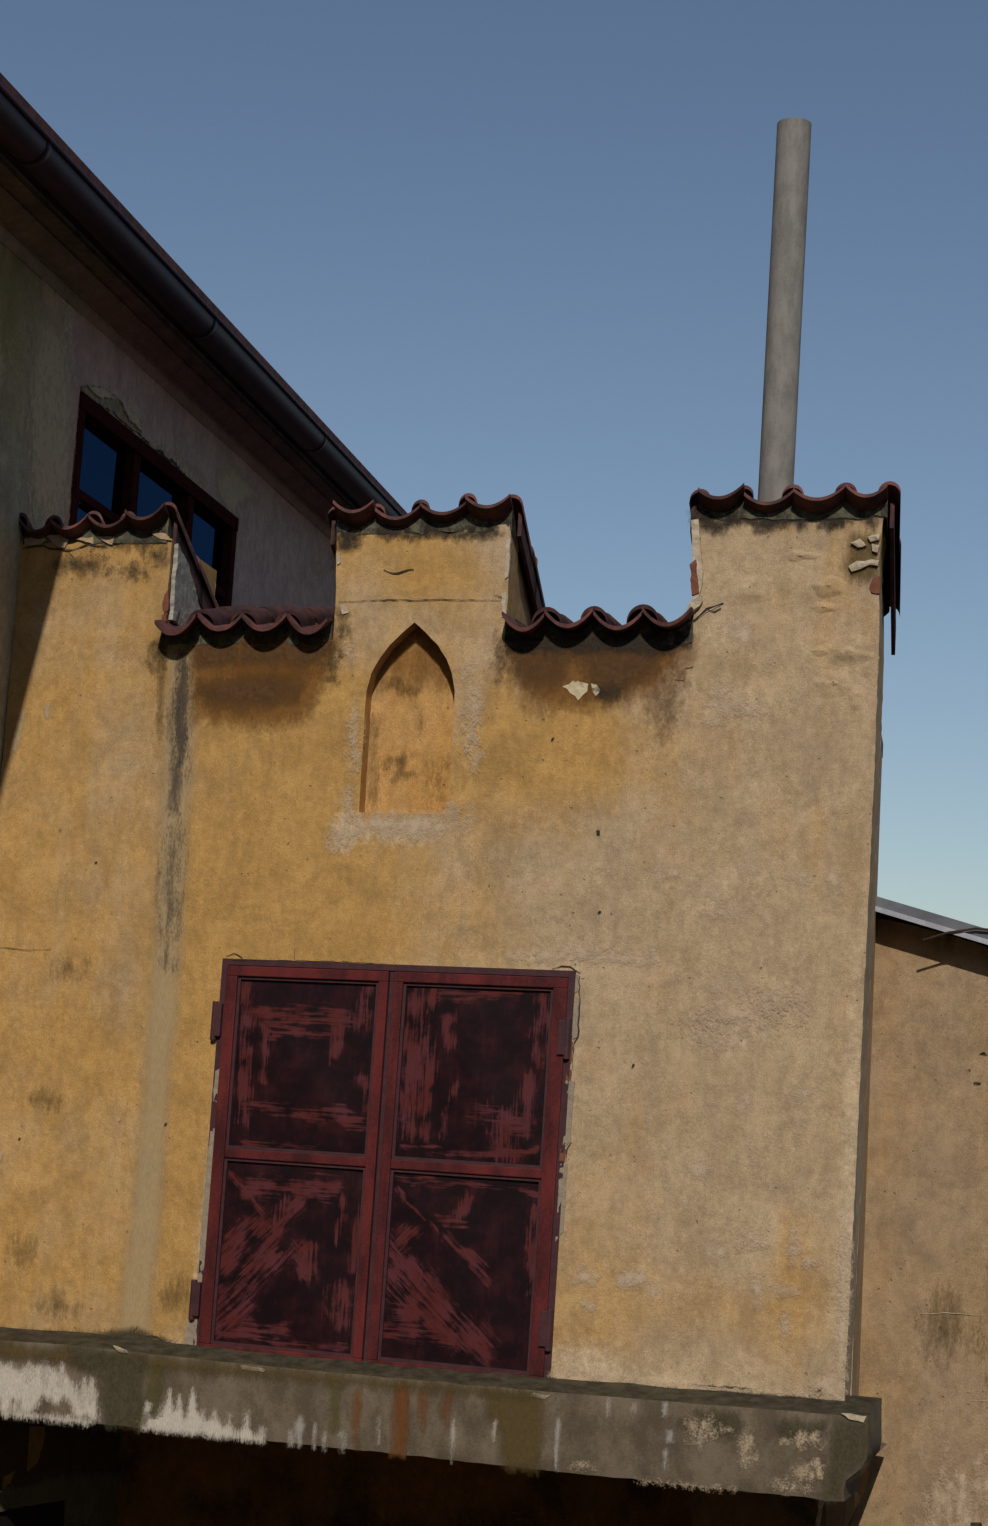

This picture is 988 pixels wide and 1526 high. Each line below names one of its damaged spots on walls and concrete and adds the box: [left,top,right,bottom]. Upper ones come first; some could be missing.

flaking render [848,534,881,594]
peeling [562,681,600,700]
leakage [506,631,691,706]
leakage [123,640,356,1331]